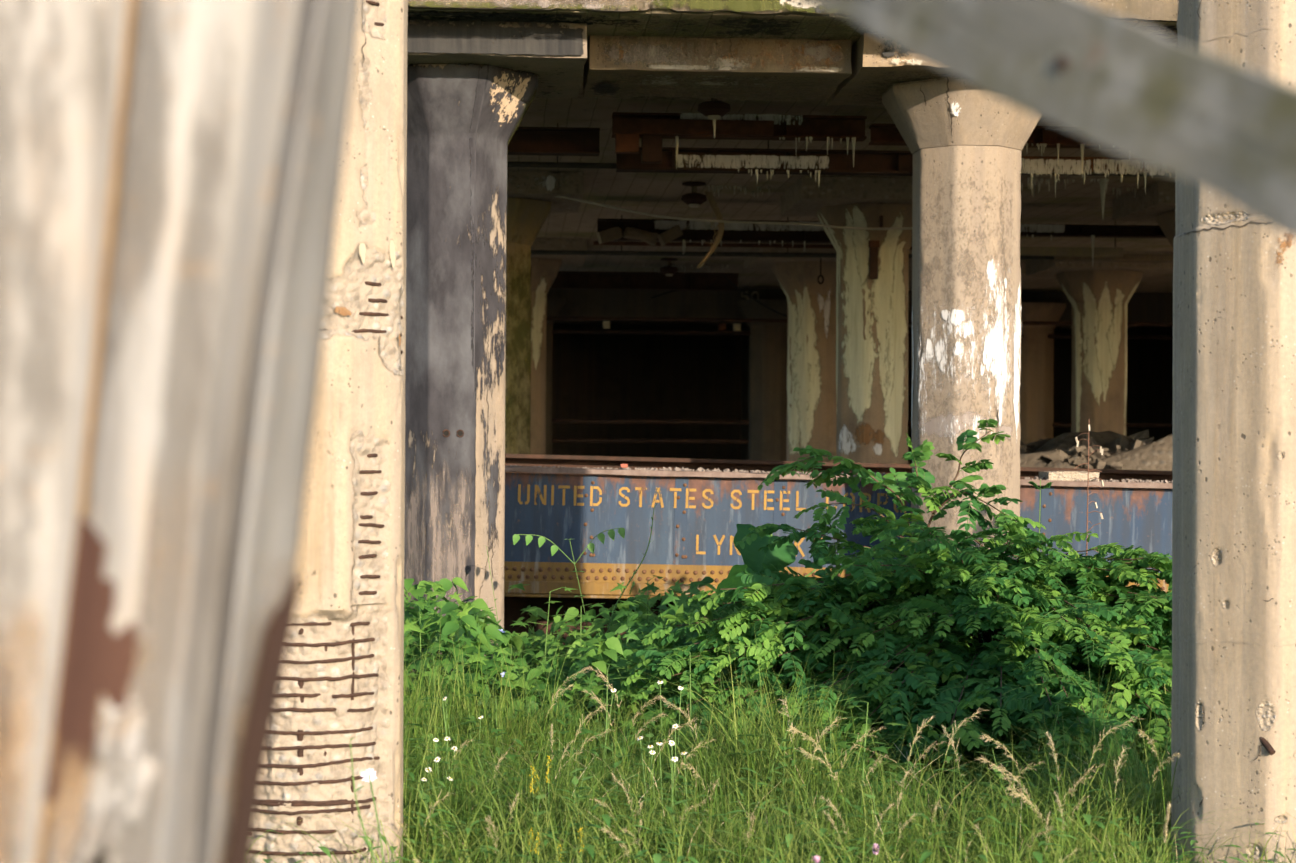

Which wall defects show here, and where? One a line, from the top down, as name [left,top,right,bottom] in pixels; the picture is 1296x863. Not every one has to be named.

damp [675,154,829,169]
crack [1180,221,1267,236]
peeling [251,0,639,863]
spalling [1256,701,1277,731]